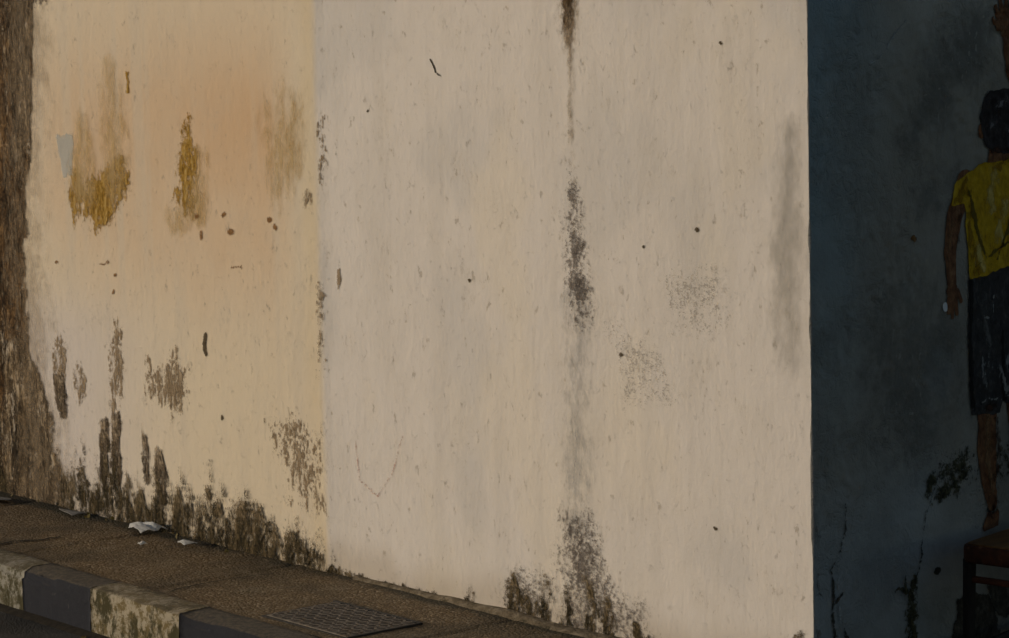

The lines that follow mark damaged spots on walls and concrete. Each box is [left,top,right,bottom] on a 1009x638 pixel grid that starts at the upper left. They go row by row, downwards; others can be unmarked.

water stain [561,0,576,78]
water stain [0,0,370,579]
water stain [564,171,593,328]
crack [830,504,849,638]
crack [895,462,944,638]